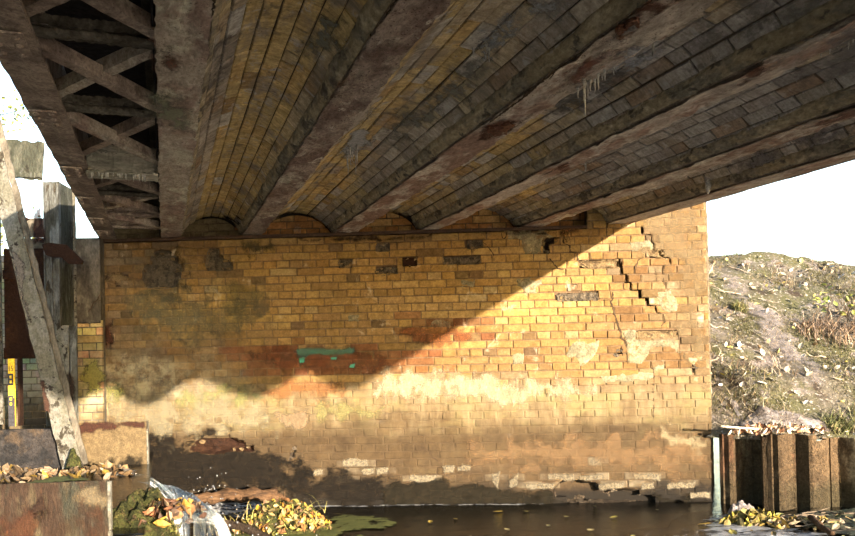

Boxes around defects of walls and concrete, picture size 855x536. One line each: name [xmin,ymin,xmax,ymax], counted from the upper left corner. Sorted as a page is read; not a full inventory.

rust [570,0,682,84]
spalling [142,250,182,289]
spalling [205,248,233,271]
crack [549,239,592,289]
crack [602,227,687,369]
rust [400,321,479,347]
rust [249,345,389,398]
efflorescence [374,366,597,409]
water stain [109,395,710,505]